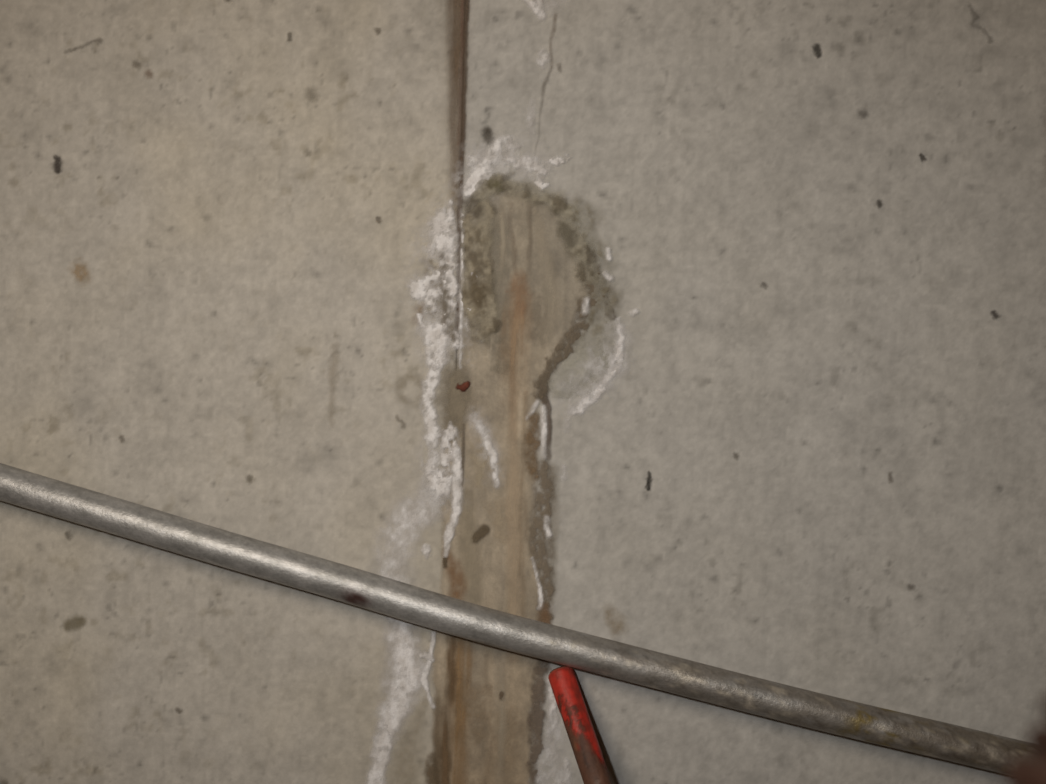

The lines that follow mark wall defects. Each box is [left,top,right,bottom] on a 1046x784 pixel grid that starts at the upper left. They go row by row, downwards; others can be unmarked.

water stain [381,137,638,624]
water stain [367,616,570,784]